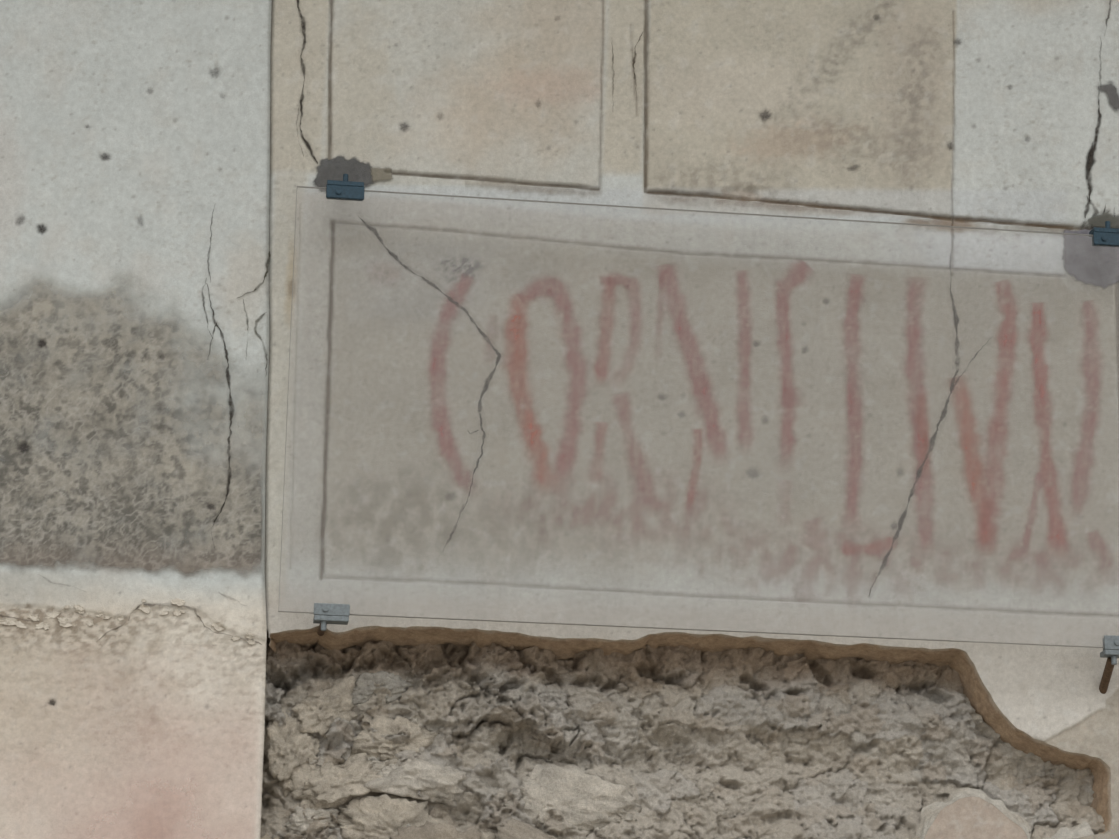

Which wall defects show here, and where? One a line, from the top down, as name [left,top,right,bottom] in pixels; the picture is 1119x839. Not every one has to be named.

crack [297,0,318,164]
crack [1085,94,1115,218]
crack [202,203,270,548]
crack [361,219,501,553]
crack [869,284,992,596]
peeling [0,605,124,633]
spalling [211,622,1112,839]